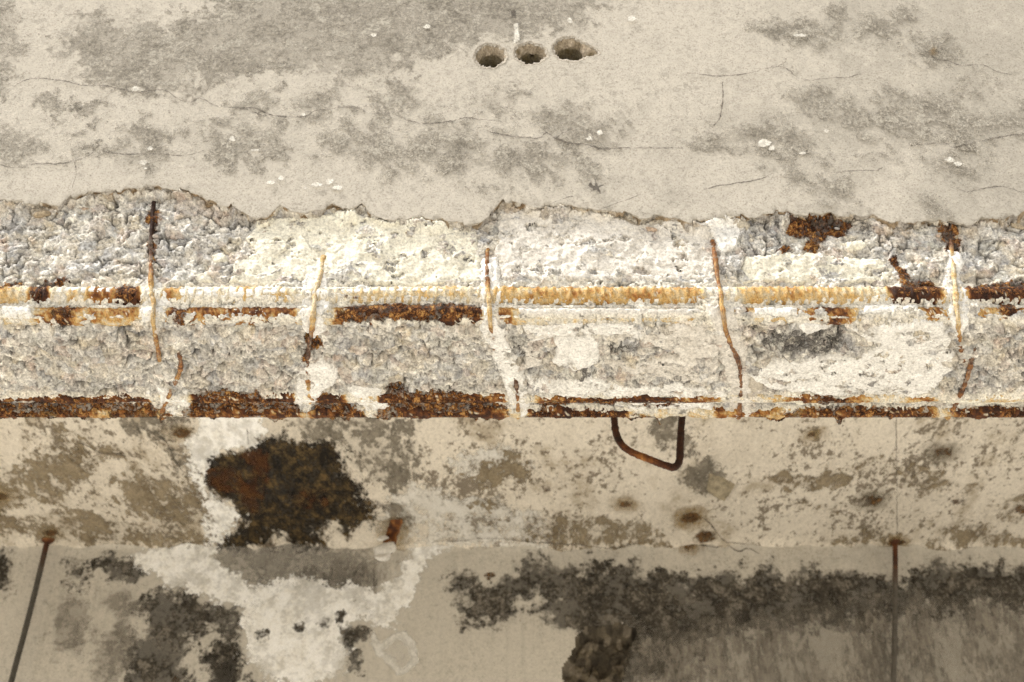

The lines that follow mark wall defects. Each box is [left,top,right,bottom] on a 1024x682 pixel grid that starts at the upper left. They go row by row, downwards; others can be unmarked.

crack [15,78,329,117]
crack [700,73,747,125]
corrosion [776,212,852,254]
corrosion [0,276,71,301]
corrosion [336,293,481,324]
spalling [0,185,1024,420]
corrosion [888,255,944,297]
corrosion [969,279,1024,316]
corrosion [527,398,689,425]
corrosion [759,394,932,425]
corrosion [0,381,509,556]
damp [0,353,1024,682]